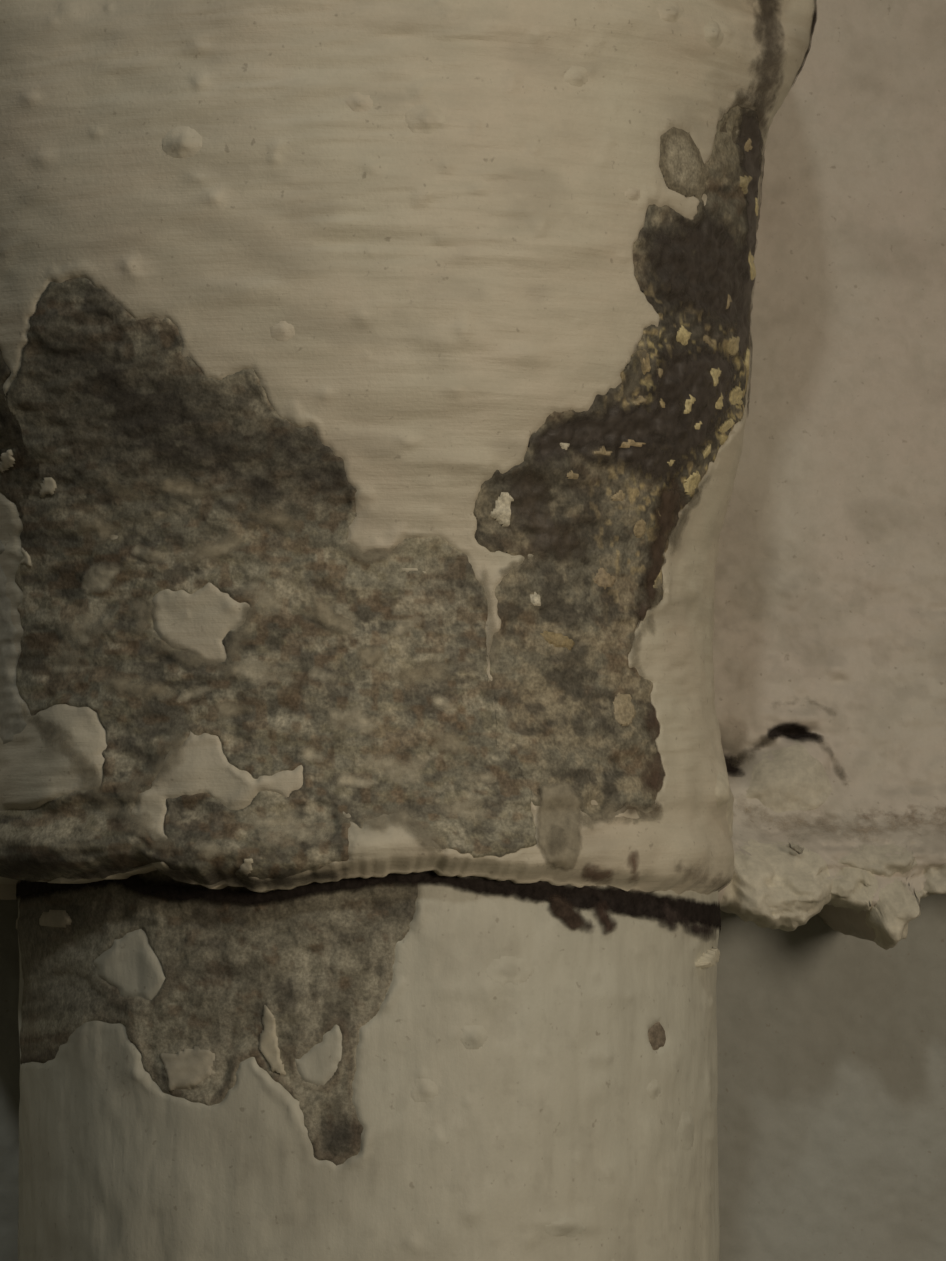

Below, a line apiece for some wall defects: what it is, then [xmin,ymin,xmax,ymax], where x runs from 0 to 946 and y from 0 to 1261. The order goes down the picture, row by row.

crack [793,0,817,85]
peeling [0,104,763,1166]
crack [724,723,845,778]
crack [16,870,721,938]